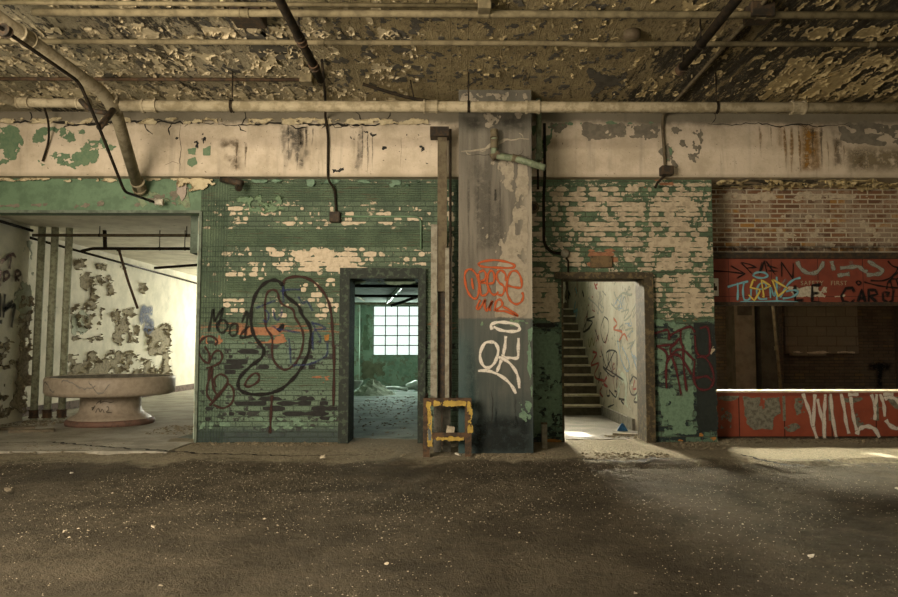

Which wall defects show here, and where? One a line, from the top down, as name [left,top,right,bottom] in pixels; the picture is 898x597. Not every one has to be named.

peeling [0,117,116,182]
leakage [285,128,313,165]
peeling [246,117,429,152]
corrosion [784,128,818,169]
peeling [306,167,344,187]
peeling [226,194,319,226]
peeling [330,207,366,226]
peeling [376,207,431,225]
peeling [481,120,898,442]
peeling [67,258,173,375]
peeling [200,247,382,377]
peeling [0,272,35,419]